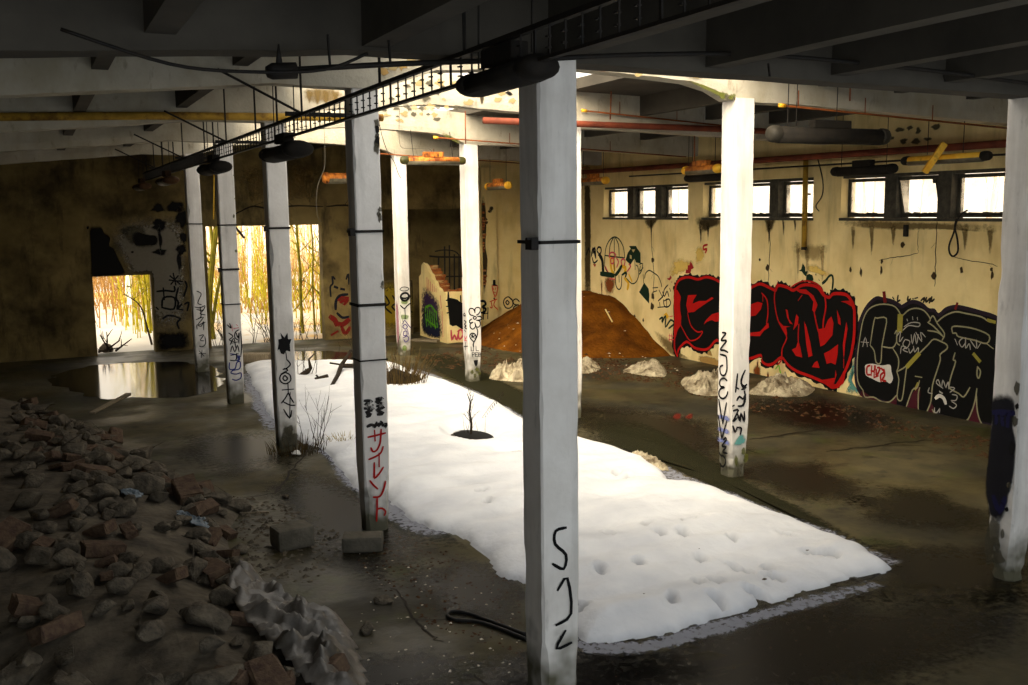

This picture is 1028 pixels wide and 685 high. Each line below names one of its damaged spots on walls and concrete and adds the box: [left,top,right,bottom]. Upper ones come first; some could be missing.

spalling [374,79,474,154]
water stain [697,219,719,242]
water stain [765,220,796,241]
water stain [851,221,993,251]